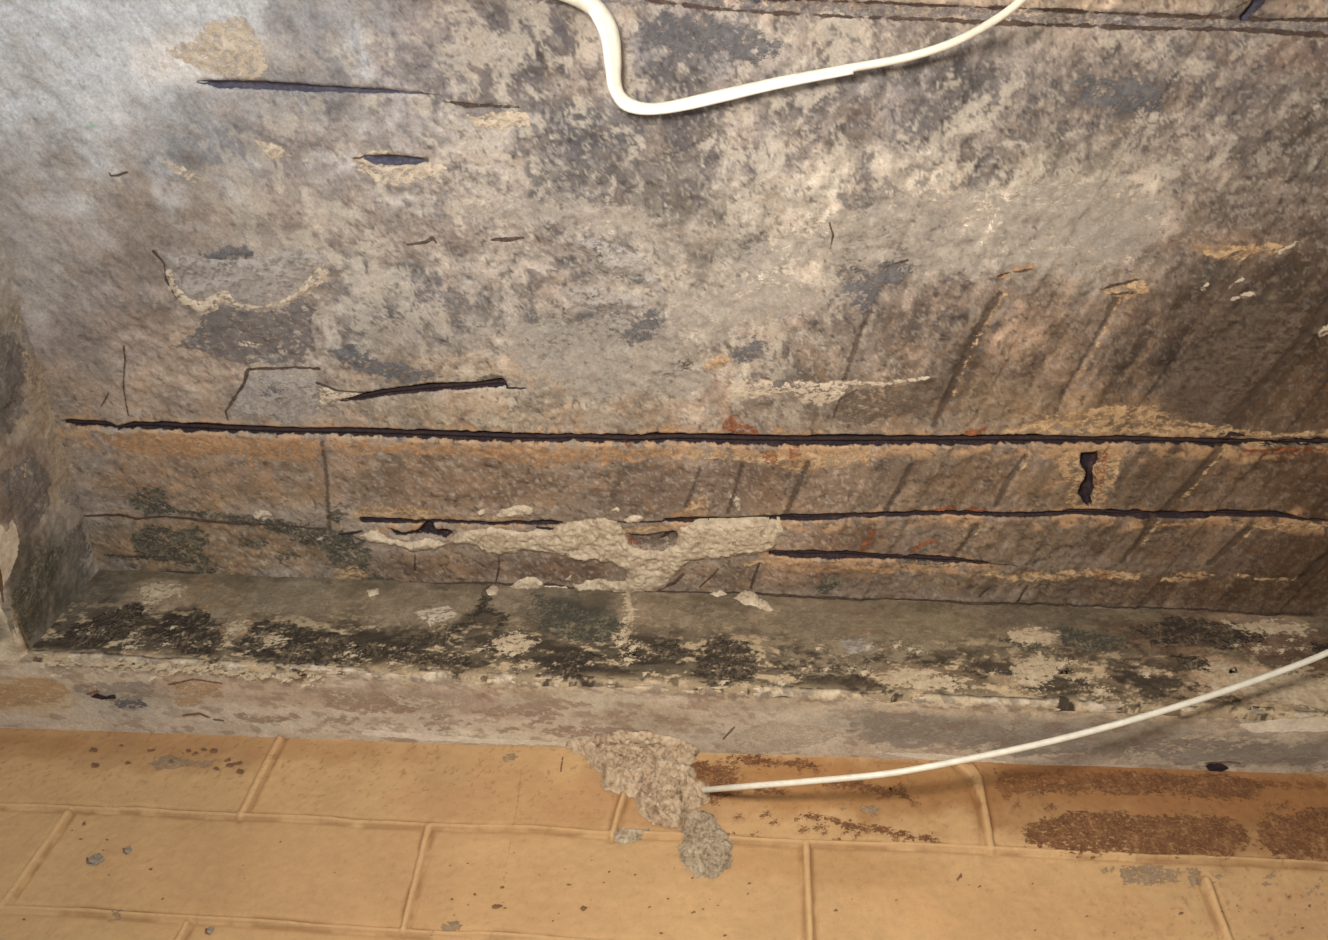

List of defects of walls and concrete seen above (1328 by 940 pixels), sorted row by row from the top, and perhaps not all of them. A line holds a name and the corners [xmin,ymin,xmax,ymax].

crack [197,80,519,108]
crack [66,346,1328,448]
hole [1078,451,1102,505]
corrosion [1005,404,1328,509]
spalling [389,521,452,538]
corrosion [353,505,526,520]
hole [623,522,678,548]
crack [617,508,1328,615]
corrosion [974,560,1142,583]
mould [57,587,624,683]
mould [651,636,757,687]
water stain [73,681,154,709]